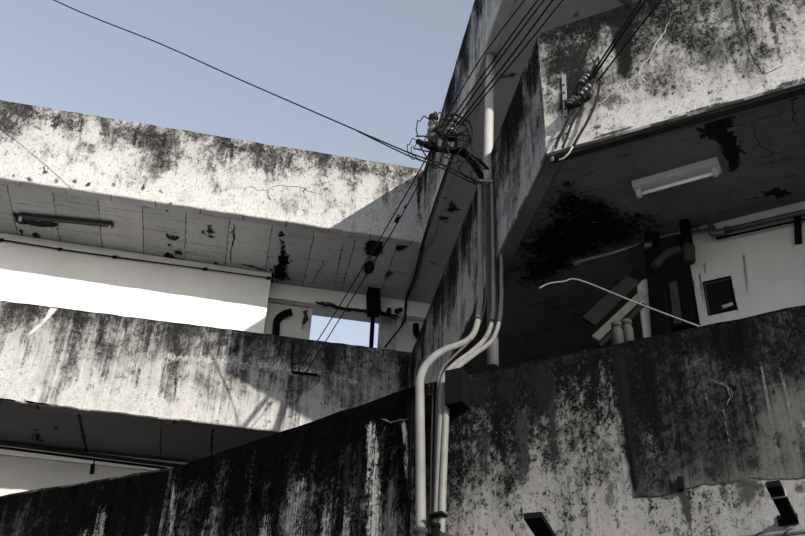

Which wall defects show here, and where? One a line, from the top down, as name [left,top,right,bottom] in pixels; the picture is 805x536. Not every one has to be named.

water stain [766,2,780,56]
water stain [501,7,639,149]
water stain [51,115,84,133]
water stain [221,142,293,171]
spalling [696,115,746,172]
water stain [329,158,425,225]
peeling [162,233,185,260]
crack [228,226,236,262]
spalling [243,231,292,283]
water stain [338,290,439,536]
water stain [470,346,639,490]
water stain [83,509,105,536]